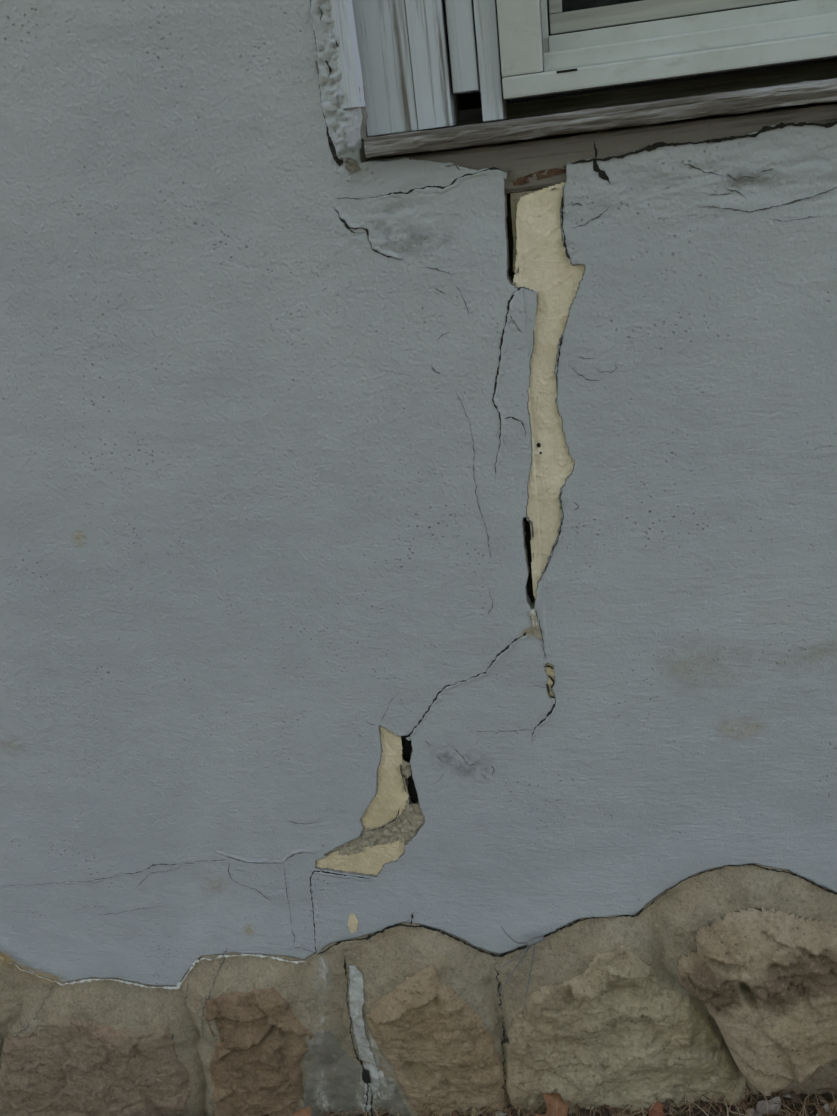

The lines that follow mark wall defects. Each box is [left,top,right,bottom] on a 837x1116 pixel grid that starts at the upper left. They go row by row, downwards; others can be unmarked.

crack [310,0,507,313]
crack [567,121,837,228]
crack [431,287,529,558]
spalling [510,180,584,645]
crack [571,357,617,381]
crack [523,517,534,602]
spalling [316,726,424,875]
crack [366,632,560,804]